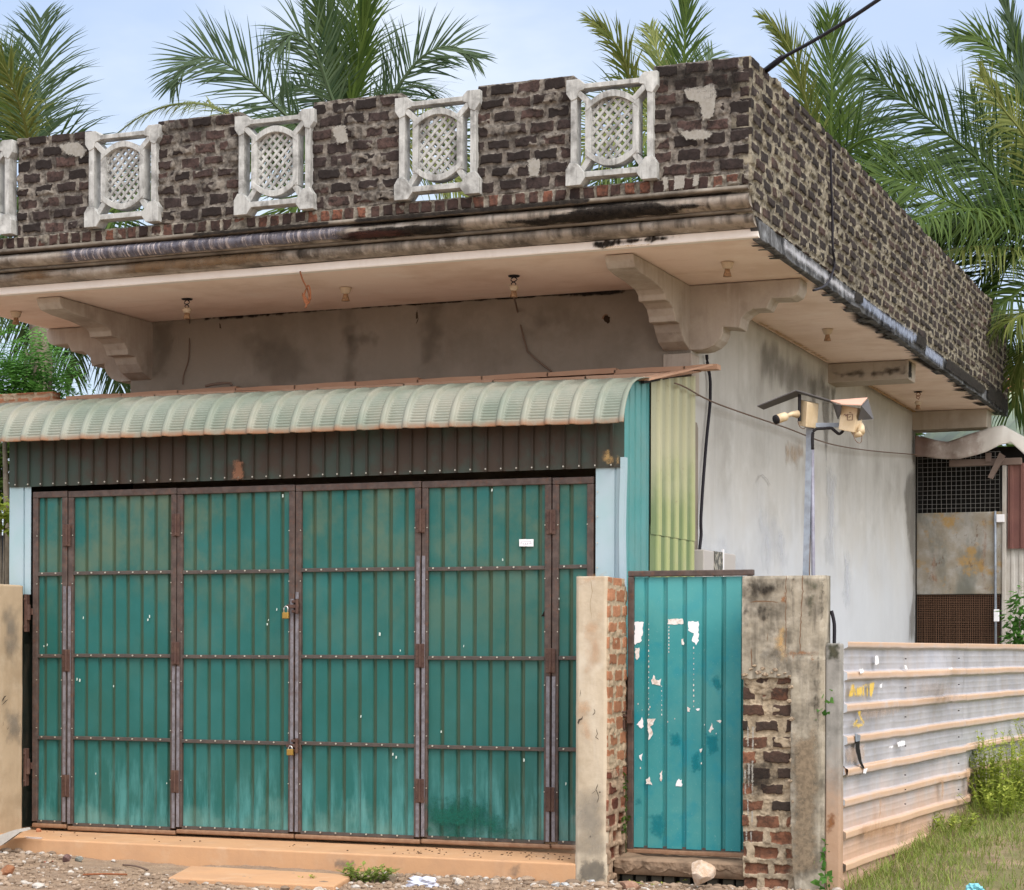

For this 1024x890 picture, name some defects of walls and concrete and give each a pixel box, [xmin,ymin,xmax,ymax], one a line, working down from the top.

leakage [64,196,709,273]
rust [233,461,244,479]
leakage [749,584,774,595]
spalling [599,664,795,890]